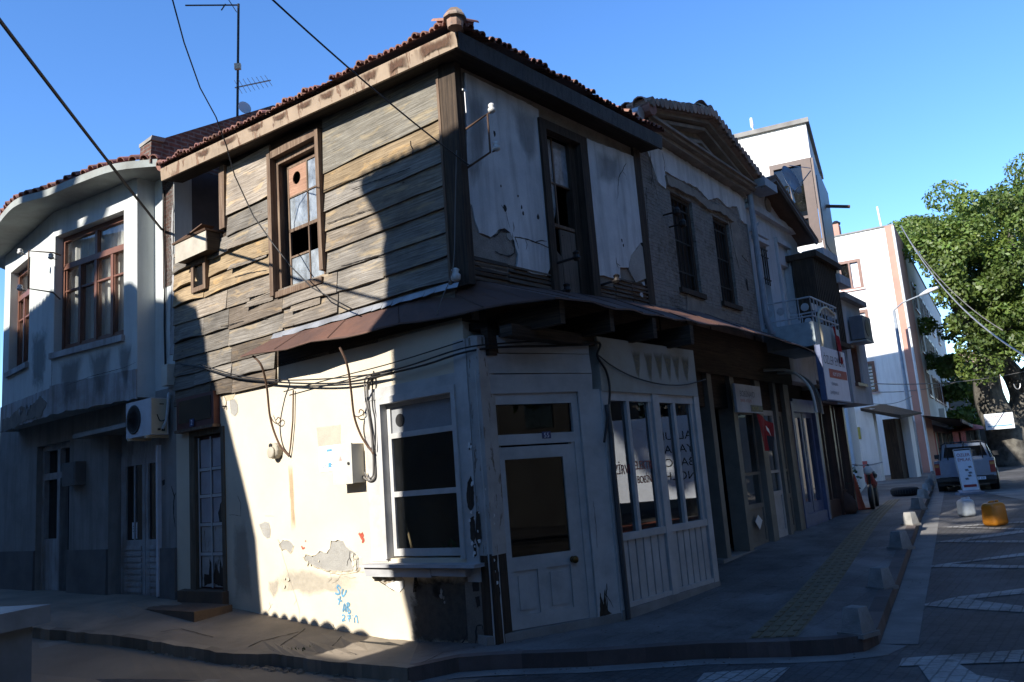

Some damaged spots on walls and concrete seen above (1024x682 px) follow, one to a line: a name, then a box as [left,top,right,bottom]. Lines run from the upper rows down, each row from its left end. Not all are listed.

spalling [471,195,552,290]
spalling [601,187,687,323]
spalling [278,538,362,574]
peeling [466,476,482,557]